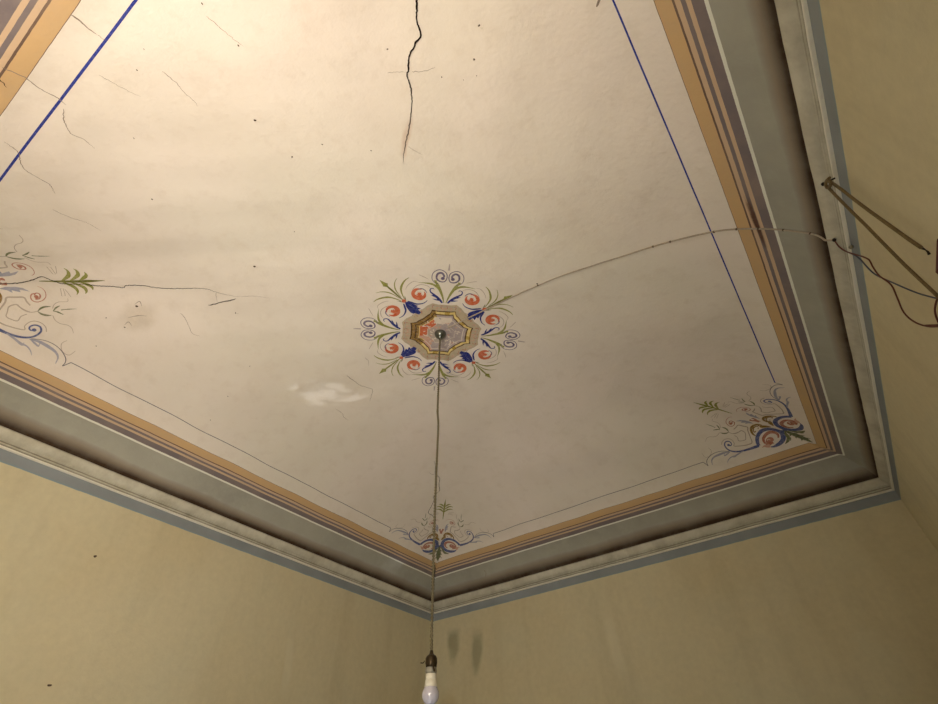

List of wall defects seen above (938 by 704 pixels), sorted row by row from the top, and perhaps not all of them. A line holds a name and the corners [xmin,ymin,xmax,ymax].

crack [0,67,94,148]
crack [388,0,435,162]
crack [0,276,270,299]